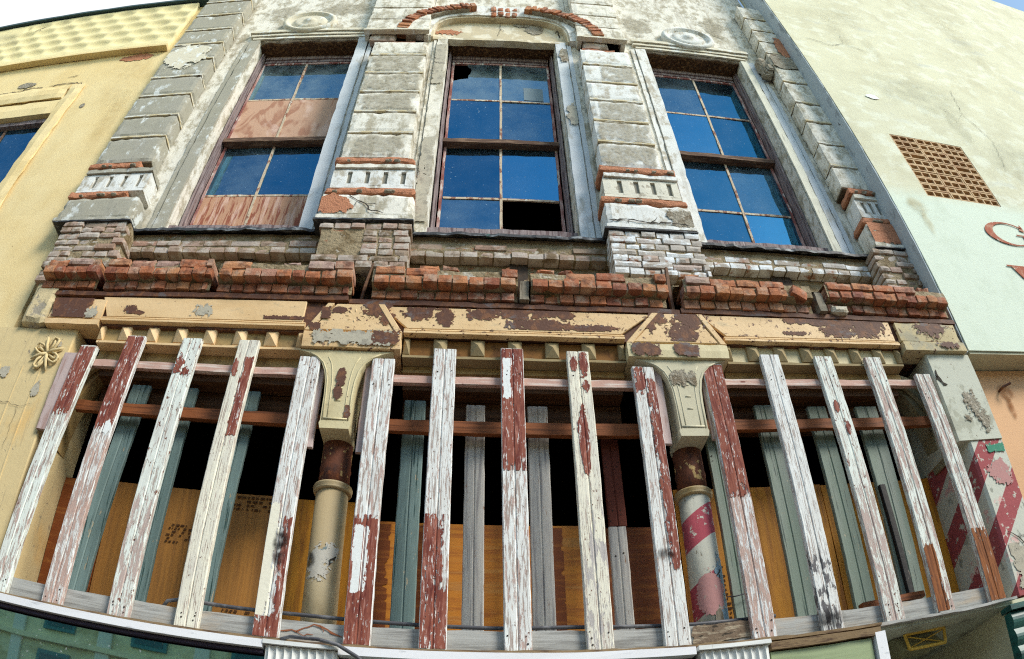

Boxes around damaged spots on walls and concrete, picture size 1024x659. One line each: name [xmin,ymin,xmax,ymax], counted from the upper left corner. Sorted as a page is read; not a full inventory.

peeling [120,44,212,69]
flaking render [318,187,416,213]
flaking render [595,143,695,228]
peeling [50,297,98,318]
peeling [912,323,960,349]
peeling [263,304,710,569]
peeling [962,389,1013,485]
peeling [306,514,378,645]
peeling [419,513,447,649]
peeling [924,543,950,611]
peeling [971,526,1006,600]